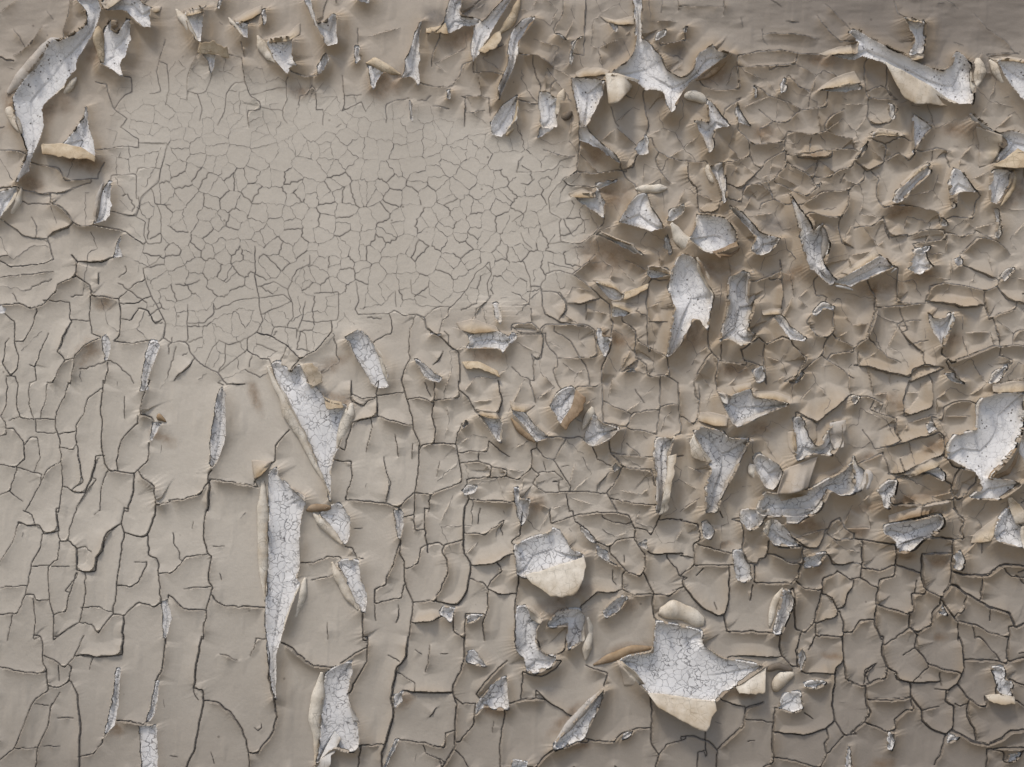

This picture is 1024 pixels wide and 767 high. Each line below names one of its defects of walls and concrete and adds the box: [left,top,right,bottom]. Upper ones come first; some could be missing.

crack [0,3,70,69]
peeling [0,0,162,224]
crack [511,0,634,101]
peeling [537,0,806,357]
crack [753,215,796,302]
crack [616,32,1019,255]
peeling [817,15,1024,239]
peeling [252,360,355,699]
crack [0,52,731,767]
peeling [513,525,826,732]
crack [681,263,1024,767]
peeling [689,364,1024,570]